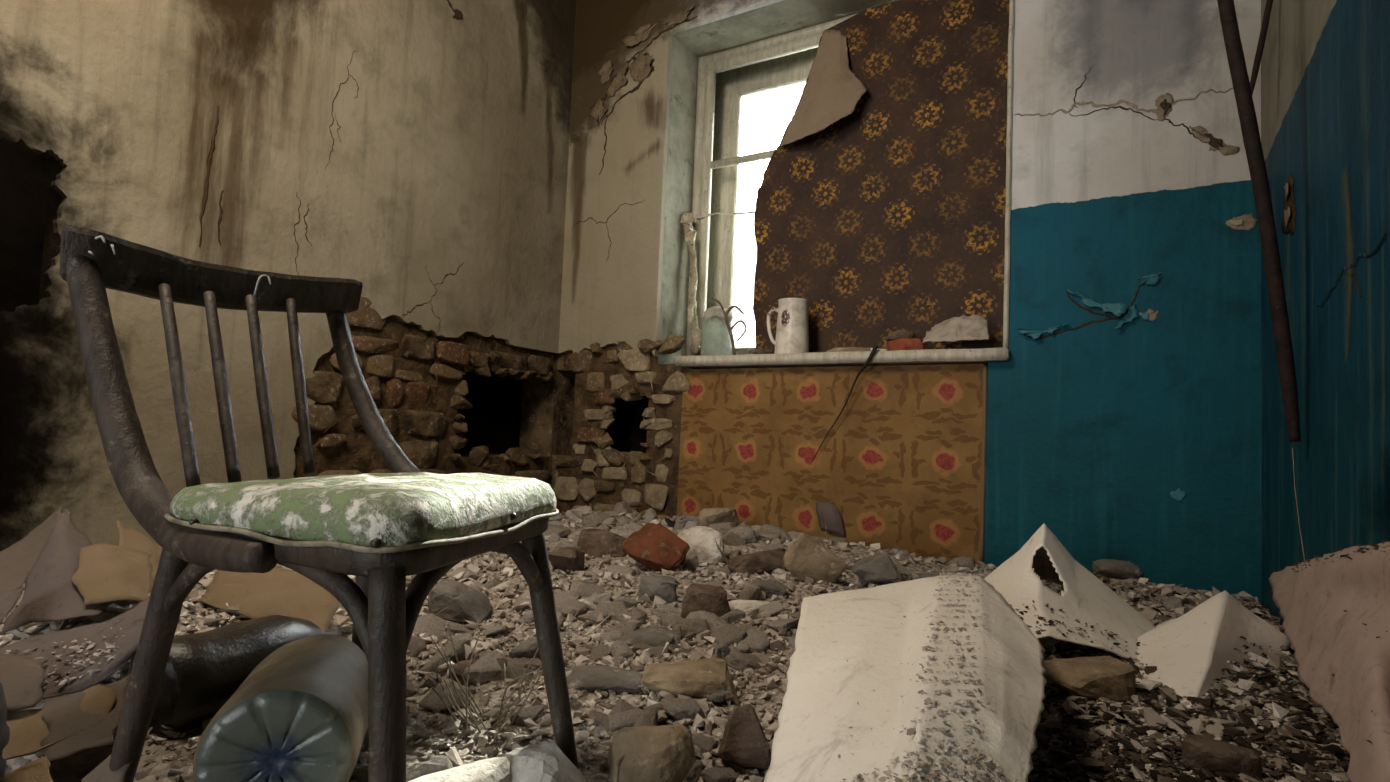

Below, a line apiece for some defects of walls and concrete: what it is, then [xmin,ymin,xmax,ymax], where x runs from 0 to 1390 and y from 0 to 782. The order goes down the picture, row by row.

water stain [199,106,223,247]
water stain [200,0,295,73]
crack [325,52,359,168]
peeling [589,3,698,174]
crack [1014,64,1233,139]
spalling [1155,93,1174,121]
spalling [1189,126,1240,156]
peeling [1018,272,1162,339]
spalling [291,347,393,477]
spalling [346,297,691,520]